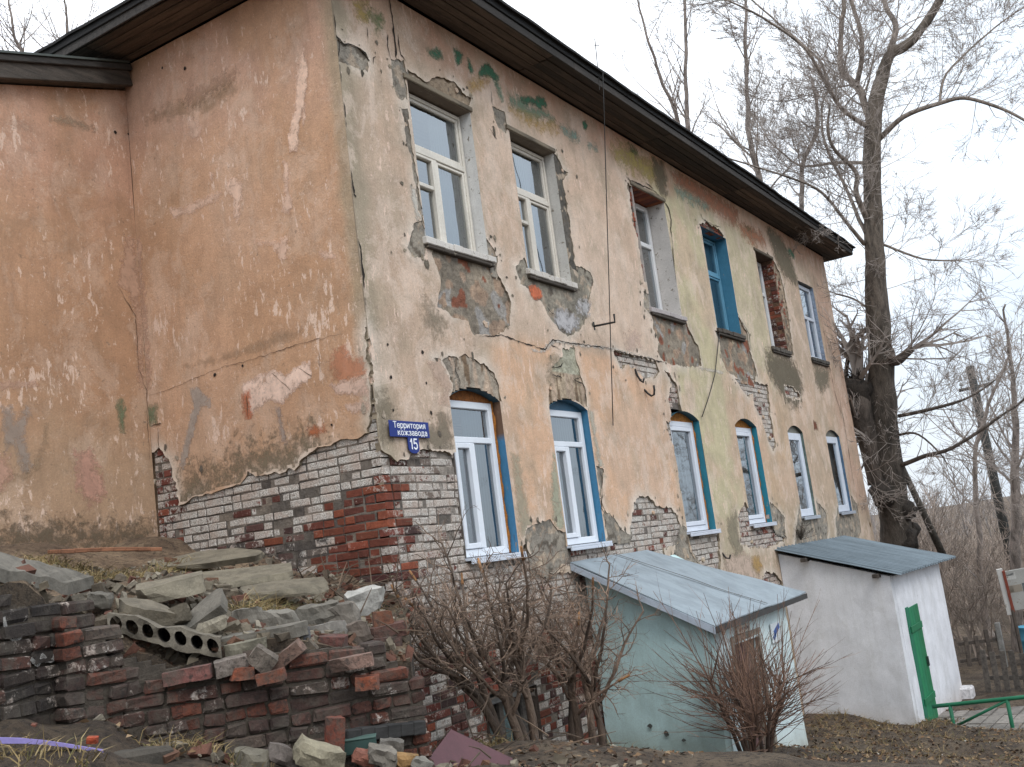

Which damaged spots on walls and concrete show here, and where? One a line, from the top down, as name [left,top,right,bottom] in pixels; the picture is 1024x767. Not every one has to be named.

spalling [337,29,594,412]
flaking render [625,174,640,250]
crack [119,288,339,458]
crack [488,308,662,398]
spalling [613,264,700,442]
spalling [715,320,778,450]
spalling [772,260,793,366]
flaking render [155,398,722,753]
flaking render [738,496,861,550]